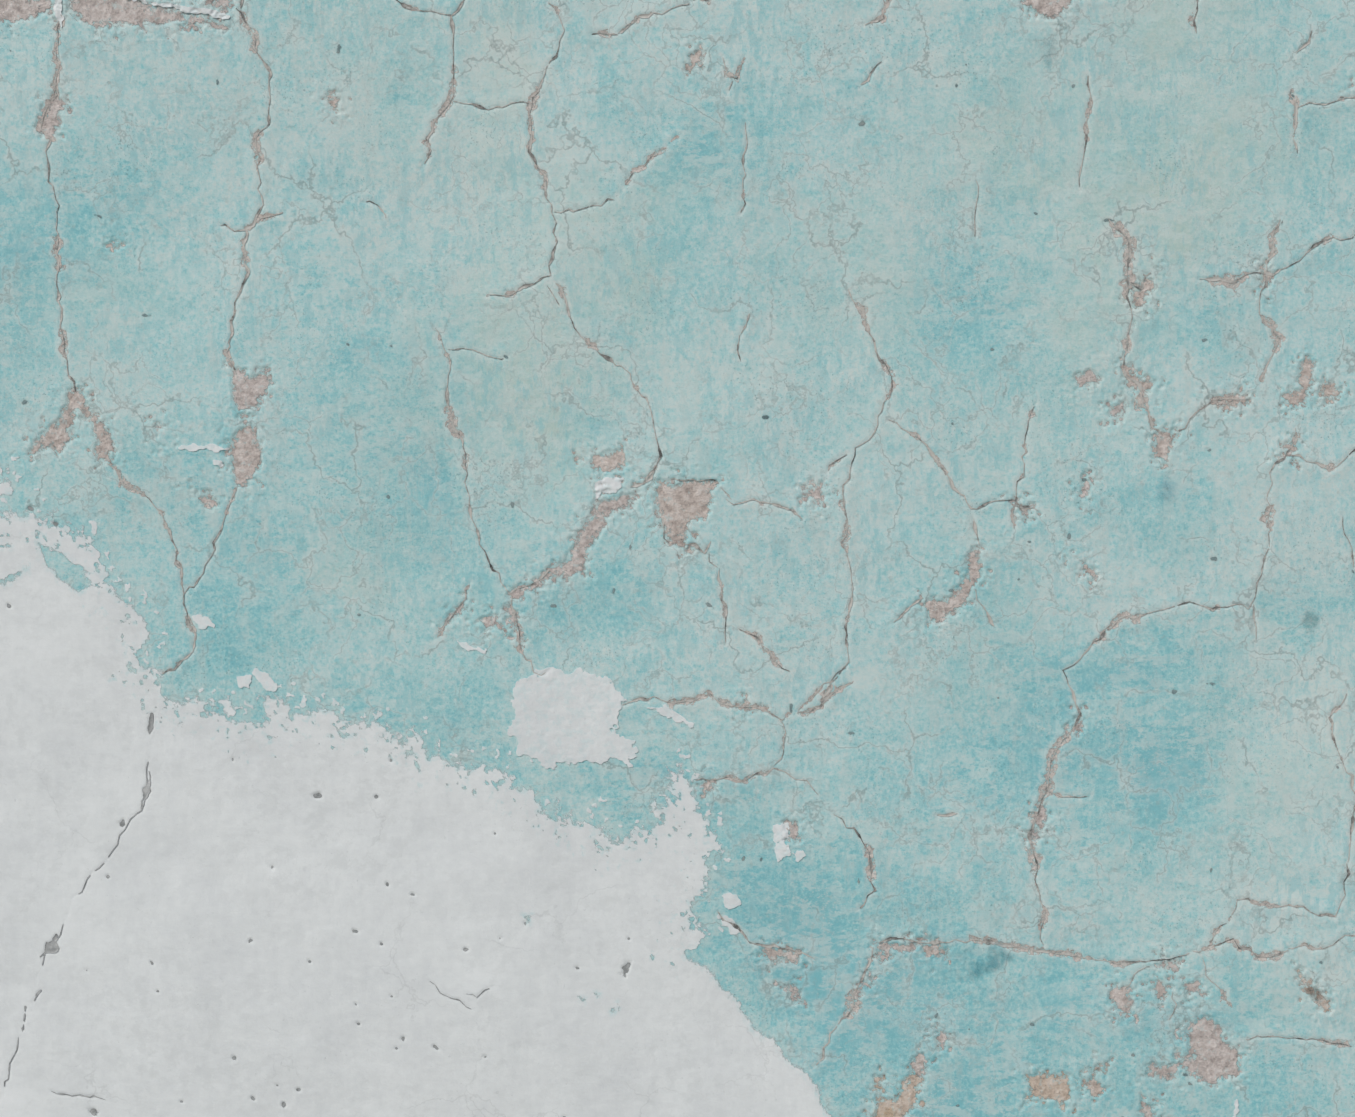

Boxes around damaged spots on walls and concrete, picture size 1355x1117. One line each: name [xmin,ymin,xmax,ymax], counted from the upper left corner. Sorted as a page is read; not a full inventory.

peeling [0,0,234,40]
peeling [220,367,274,488]
crack [221,0,283,375]
crack [397,0,802,519]
crack [1108,219,1355,434]
peeling [438,439,724,642]
crack [622,289,1038,908]
crack [816,428,1355,1065]
crack [4,924,63,1087]
peeling [862,1019,952,1117]
peeling [1025,1057,1114,1114]
peeling [1140,1016,1242,1117]